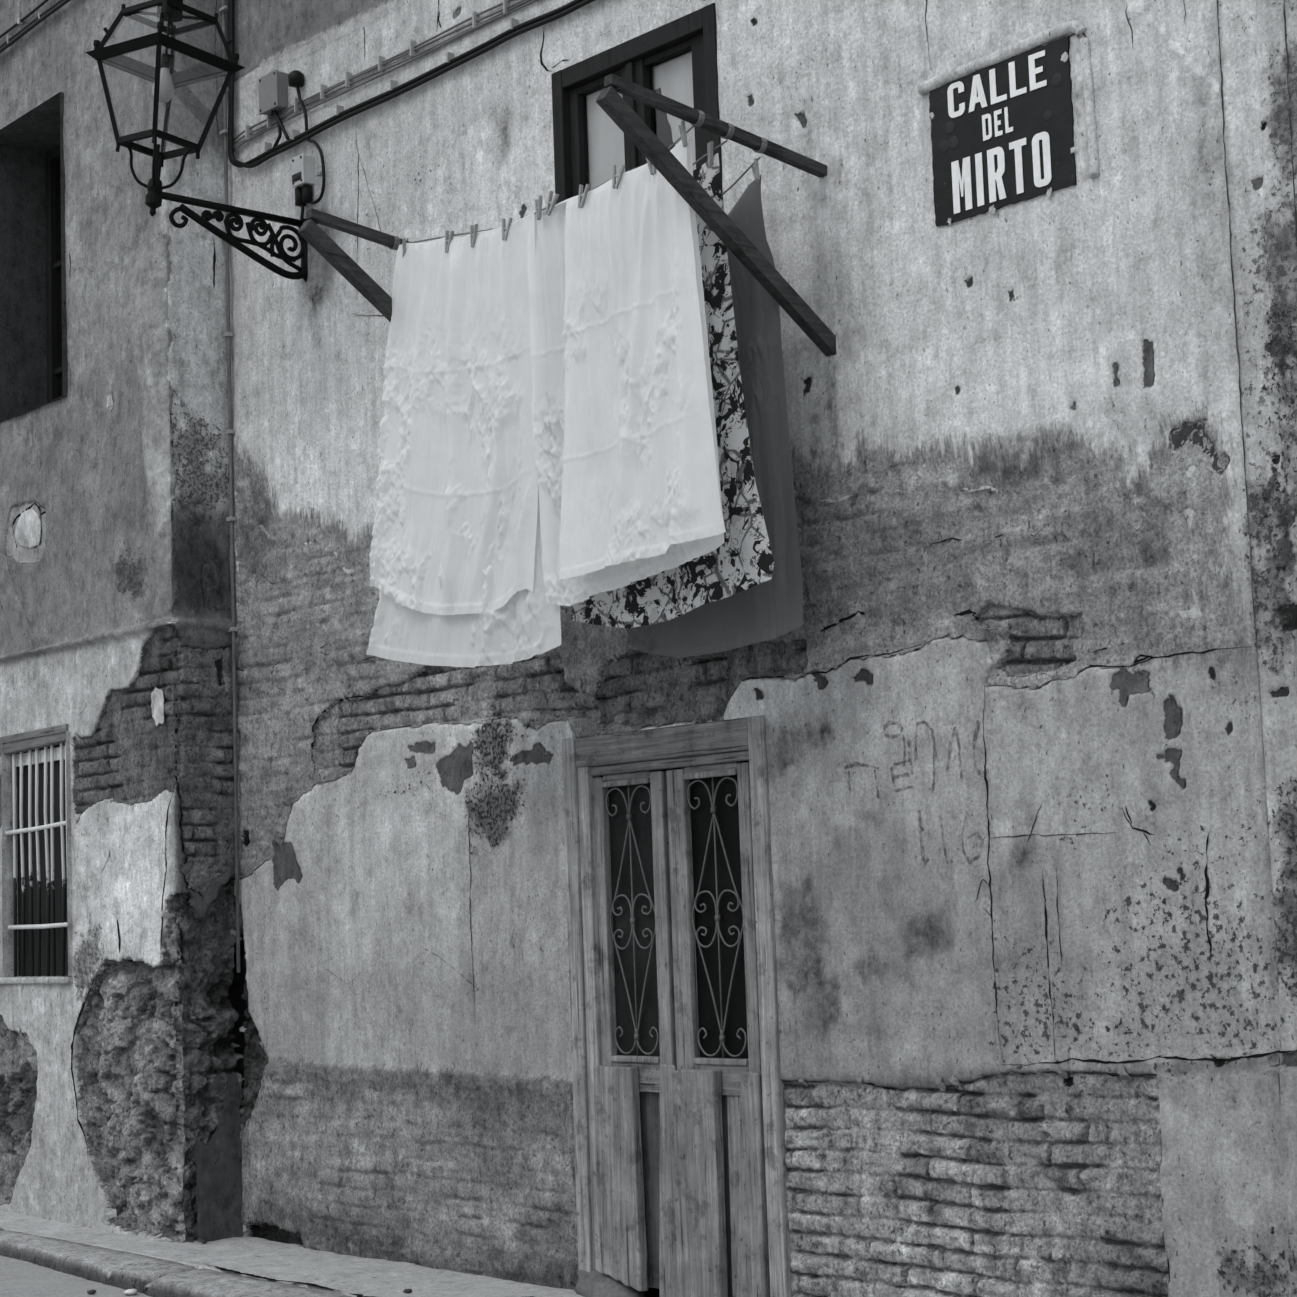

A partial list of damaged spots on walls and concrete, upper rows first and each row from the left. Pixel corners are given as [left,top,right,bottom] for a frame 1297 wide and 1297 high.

peeling [794,112,807,127]
peeling [1240,42,1297,428]
peeling [1112,362,1120,387]
peeling [1142,339,1154,388]
crack [1083,0,1269,838]
flaking render [5,501,46,563]
crack [820,604,865,632]
crack [955,609,979,621]
crack [721,640,931,719]
flaking render [72,385,1297,1297]
crack [975,685,1297,1101]
flaking render [0,1015,38,1205]